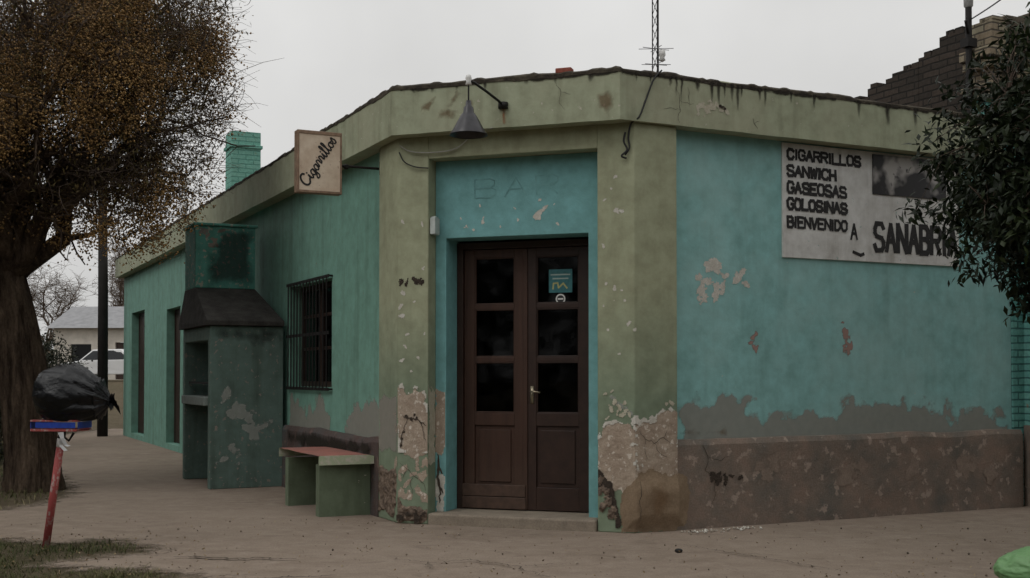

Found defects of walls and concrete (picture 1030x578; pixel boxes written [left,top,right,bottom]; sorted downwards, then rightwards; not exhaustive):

leakage [525,71,836,103]
peeling [695,257,750,305]
peeling [345,383,445,524]
crack [400,416,443,503]
peeling [598,390,1007,528]